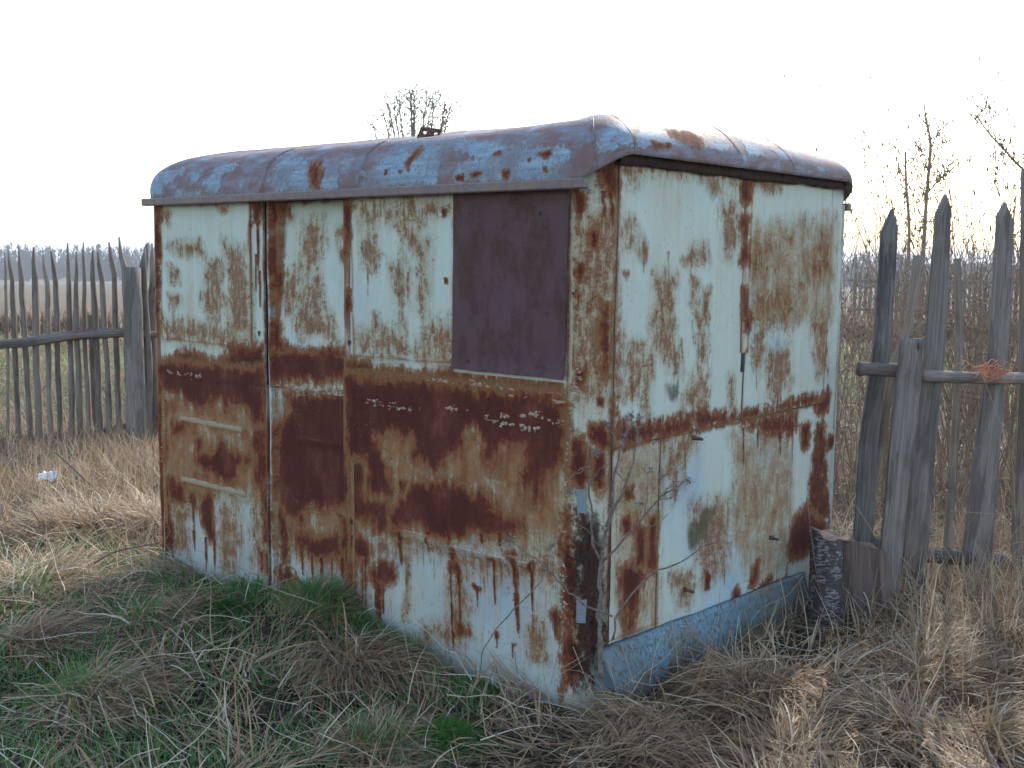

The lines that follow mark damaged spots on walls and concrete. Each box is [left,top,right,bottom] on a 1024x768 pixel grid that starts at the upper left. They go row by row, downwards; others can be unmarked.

rust [651,128,705,150]
rust [384,145,424,175]
rust [527,149,553,173]
rust [154,158,838,694]